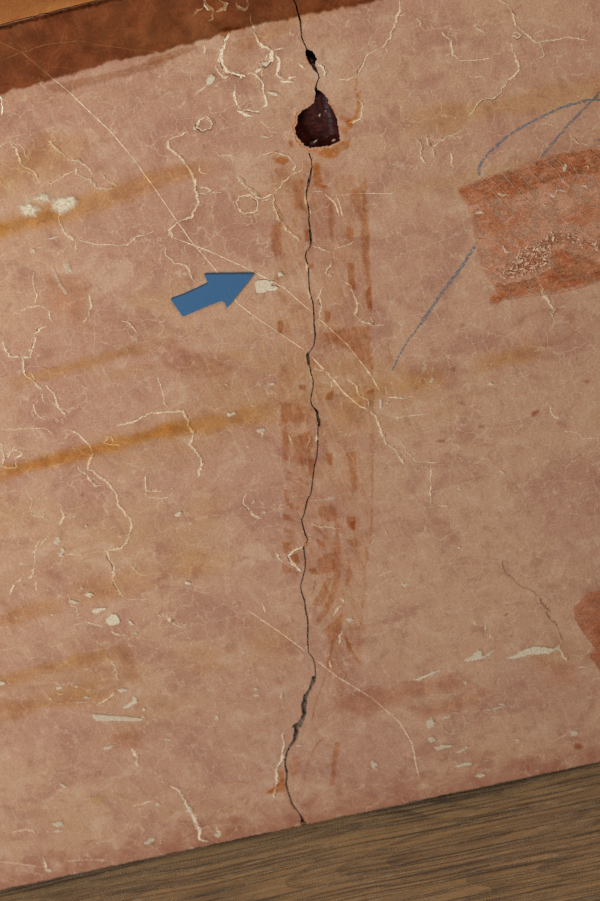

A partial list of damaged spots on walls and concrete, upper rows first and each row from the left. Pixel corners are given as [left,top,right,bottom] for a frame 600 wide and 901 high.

crack [271,153,450,822]